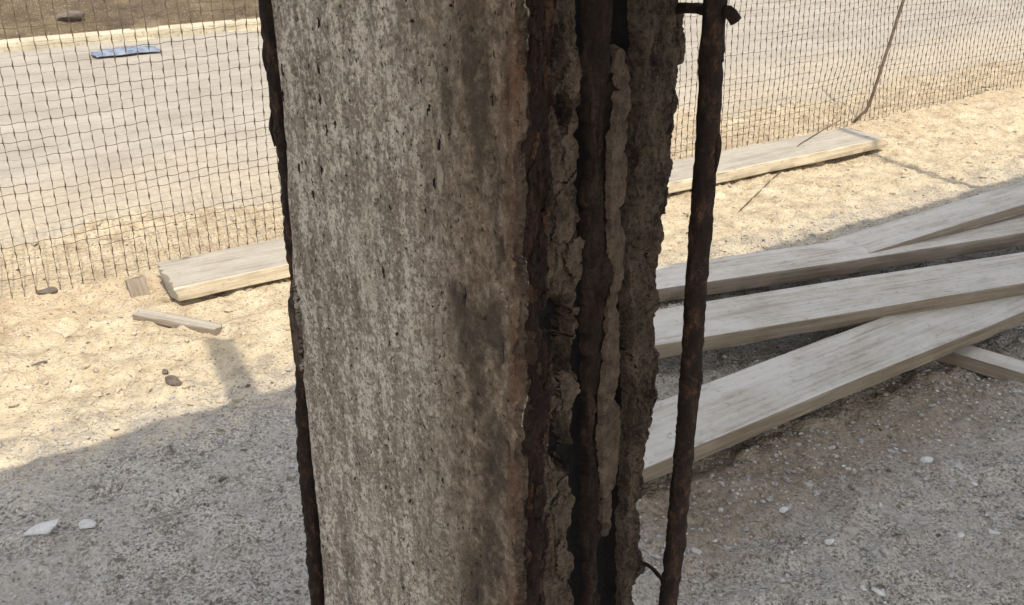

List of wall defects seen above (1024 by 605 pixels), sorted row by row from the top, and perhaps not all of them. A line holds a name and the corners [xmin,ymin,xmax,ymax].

corrosion [521,0,558,605]
spalling [512,0,585,605]
corrosion [577,0,617,605]
peeling [595,44,631,536]
spalling [633,548,646,580]
spalling [645,301,661,317]
spalling [649,368,659,417]
spalling [669,14,686,138]